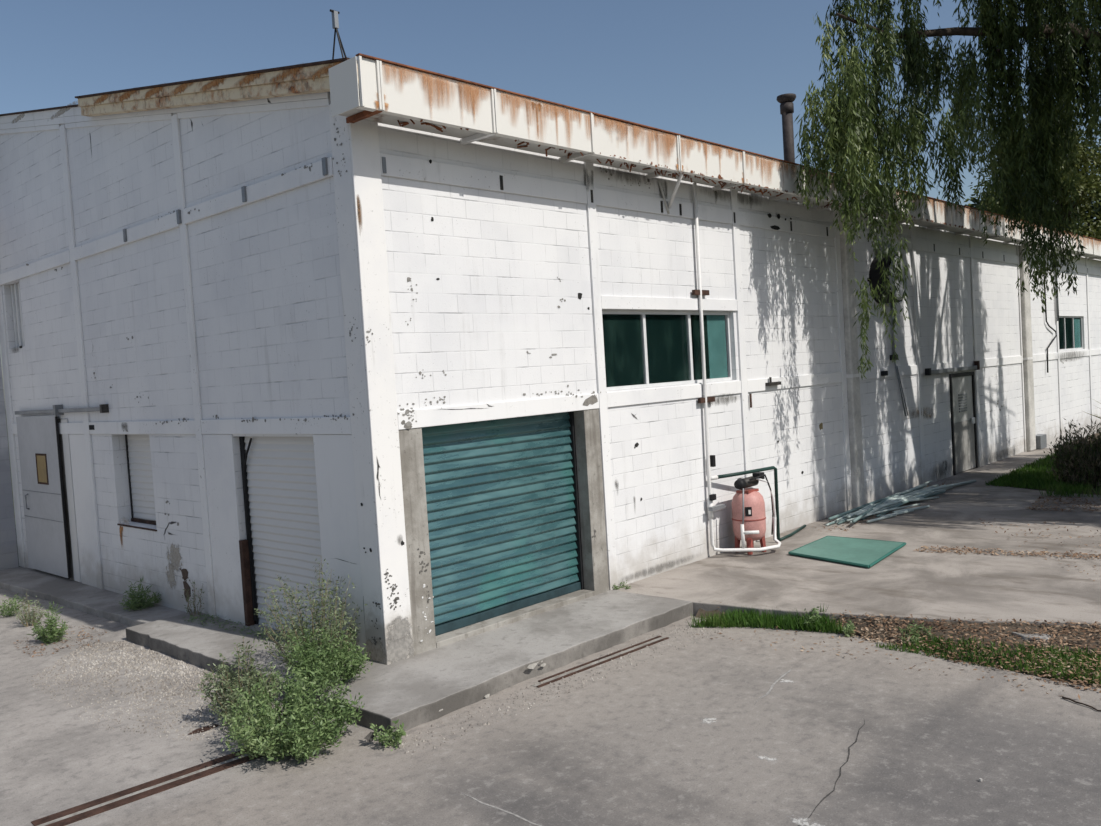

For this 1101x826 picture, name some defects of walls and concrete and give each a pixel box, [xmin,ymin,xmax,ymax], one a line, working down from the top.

corrosion [94,78,225,105]
corrosion [239,67,302,85]
corrosion [385,65,487,115]
corrosion [501,94,835,195]
peeling [397,396,446,429]
spalling [523,385,601,406]
peeling [166,565,188,587]
peeling [366,548,434,664]
crack [798,720,865,826]
crack [460,792,542,826]